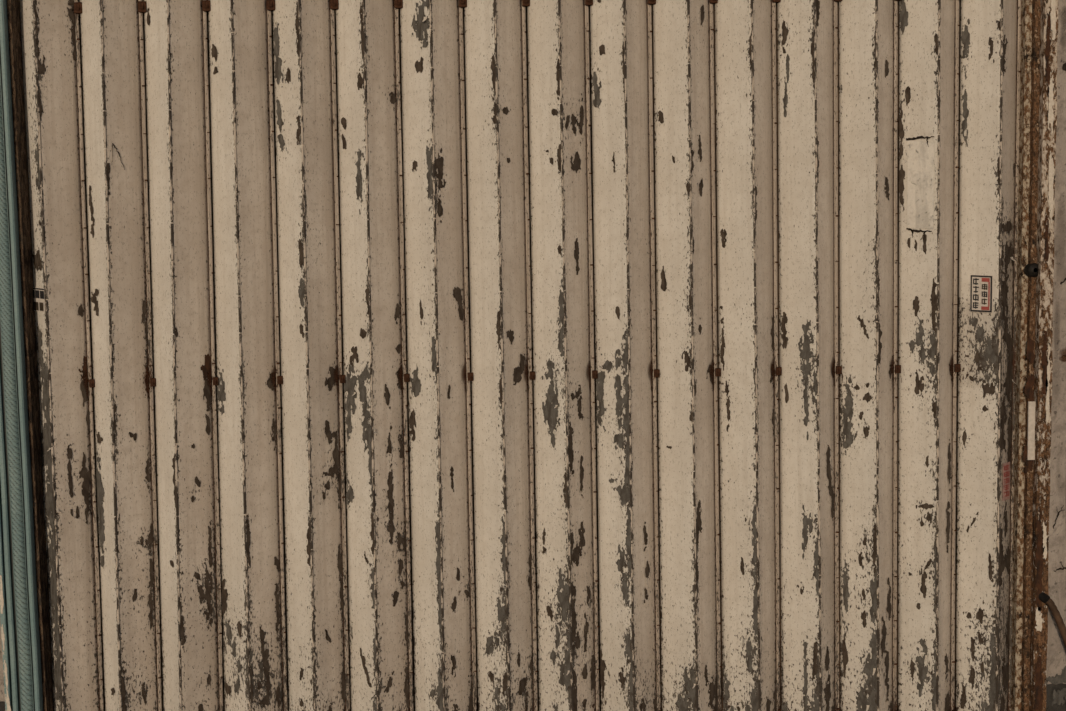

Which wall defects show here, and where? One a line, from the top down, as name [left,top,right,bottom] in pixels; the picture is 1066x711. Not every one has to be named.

peeling [194,521,281,708]
peeling [322,285,375,609]
peeling [384,344,421,607]
peeling [541,279,584,504]
peeling [546,522,606,711]
peeling [596,306,650,607]
peeling [770,312,817,440]
peeling [802,525,893,711]
peeling [909,278,938,424]
corrosion [1023,439,1034,473]
corrosion [1035,506,1045,612]
corrosion [1024,330,1066,401]